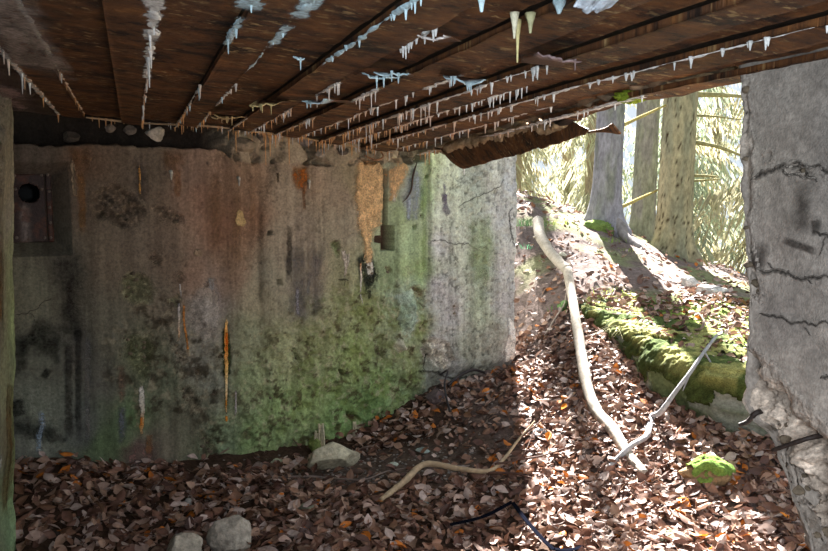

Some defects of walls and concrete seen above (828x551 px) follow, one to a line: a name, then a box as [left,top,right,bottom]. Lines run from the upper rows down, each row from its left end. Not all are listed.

efflorescence [142,0,166,78]
leakage [487,97,647,137]
rust [293,168,308,208]
rust [355,161,408,274]
crack [759,231,828,284]
leakage [59,261,89,430]
leakage [222,328,231,375]
crack [759,313,828,336]
leakage [13,400,54,448]
spalling [742,346,828,551]